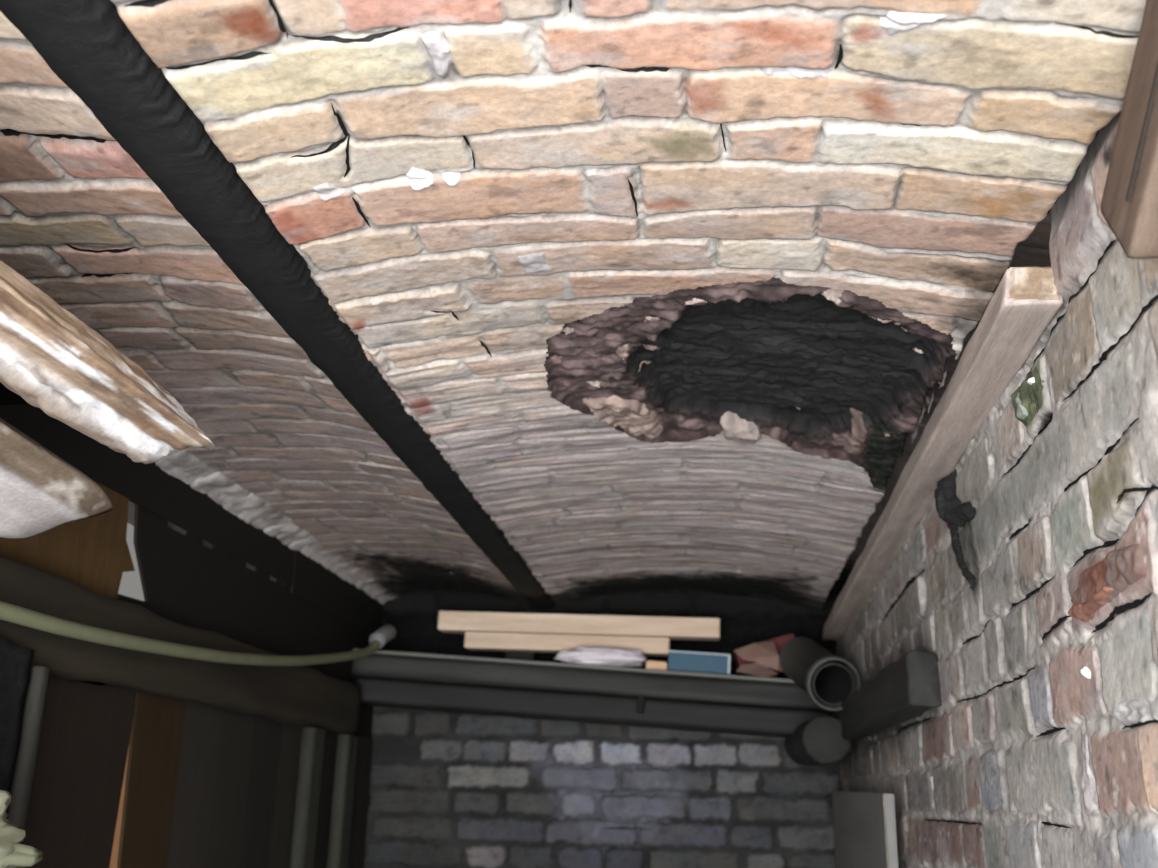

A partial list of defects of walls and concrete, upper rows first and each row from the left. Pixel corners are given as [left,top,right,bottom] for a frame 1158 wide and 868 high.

crack [291,103,371,228]
spalling [544,277,956,493]
crack [1117,485,1158,517]
crack [1009,515,1034,540]
water stain [356,554,502,595]
water stain [569,574,815,607]
crack [882,569,925,621]
crack [897,539,1158,732]